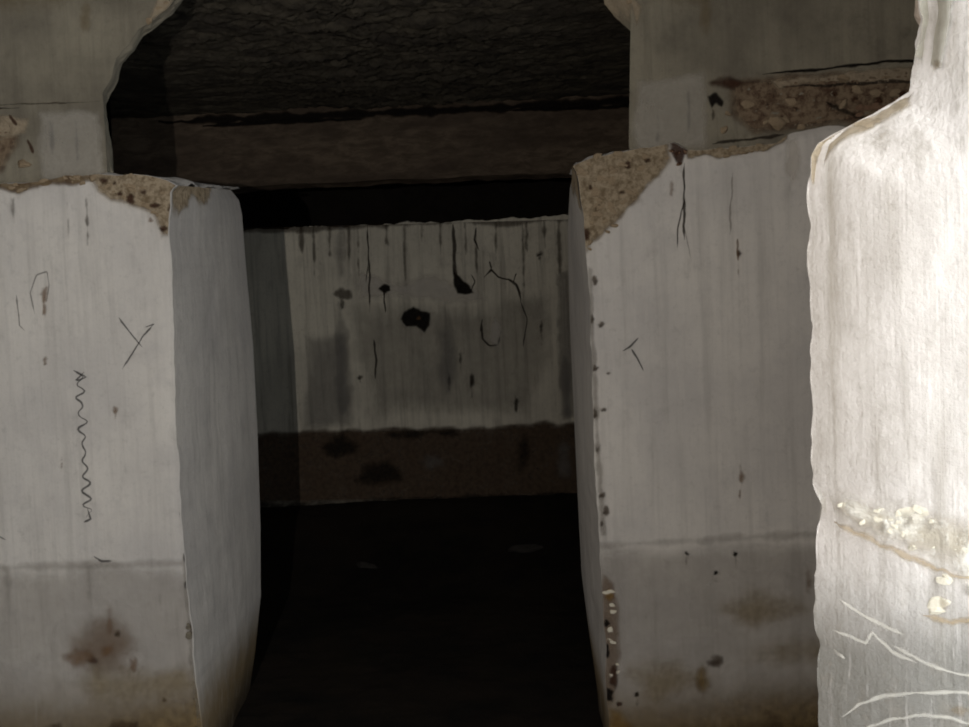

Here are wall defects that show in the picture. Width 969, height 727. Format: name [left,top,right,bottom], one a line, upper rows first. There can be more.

spalling [0,108,34,170]
spalling [571,0,953,251]
spalling [0,173,211,234]
leakage [258,421,578,508]
leakage [697,658,721,689]
leakage [726,701,819,727]